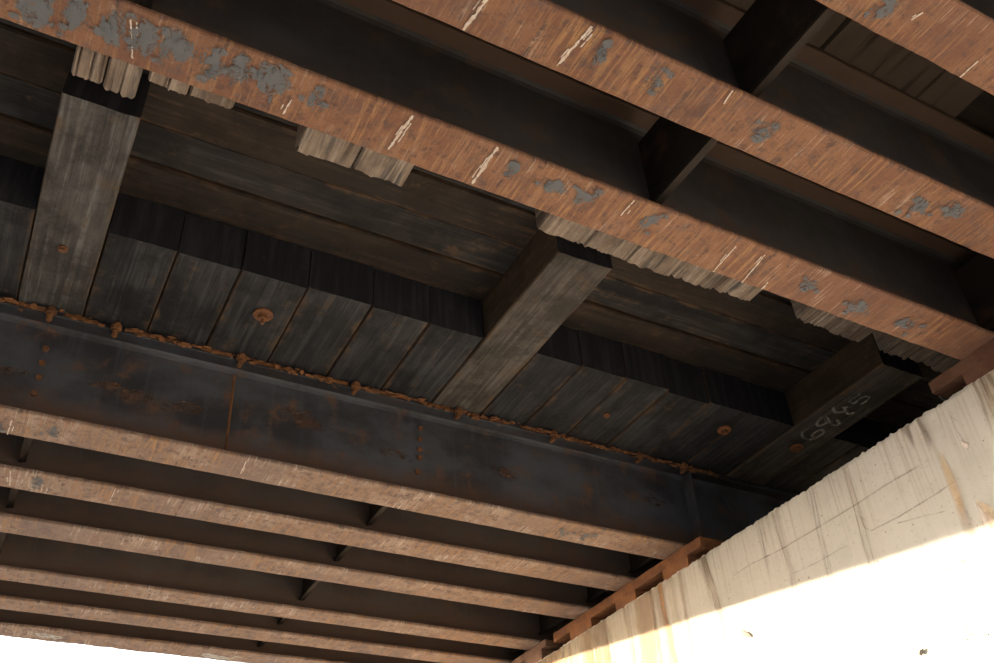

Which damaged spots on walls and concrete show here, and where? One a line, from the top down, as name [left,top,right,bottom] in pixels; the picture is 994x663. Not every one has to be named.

peeling [7,0,330,110]
peeling [533,177,606,206]